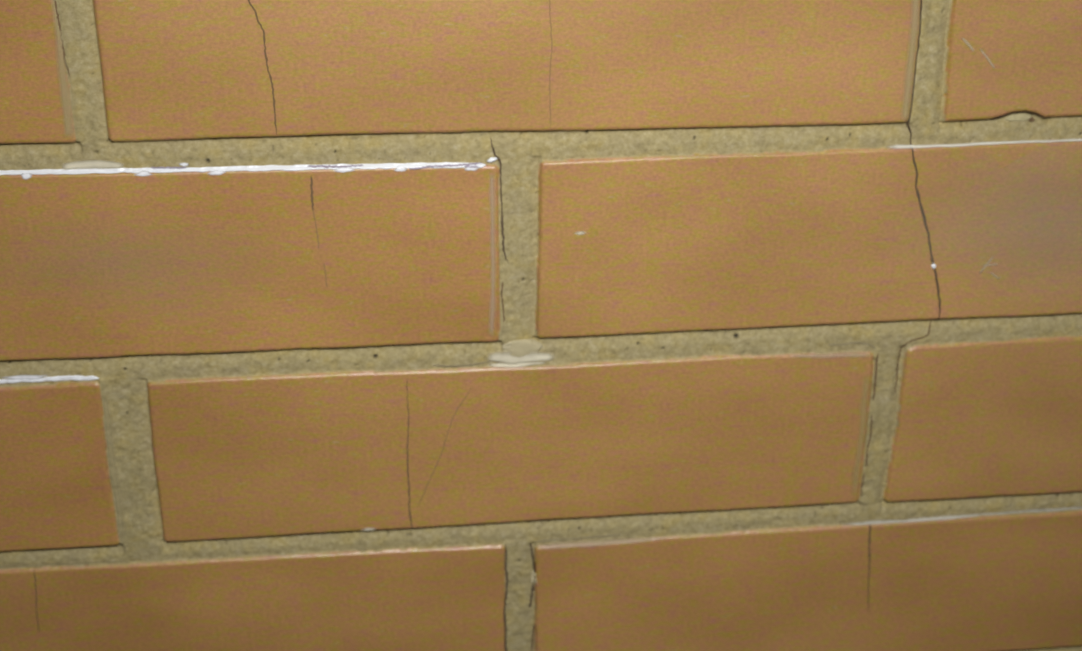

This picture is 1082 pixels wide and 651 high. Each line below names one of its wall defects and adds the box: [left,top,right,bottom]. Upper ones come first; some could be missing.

crack [248,0,277,135]
crack [828,0,941,496]
crack [406,360,497,529]